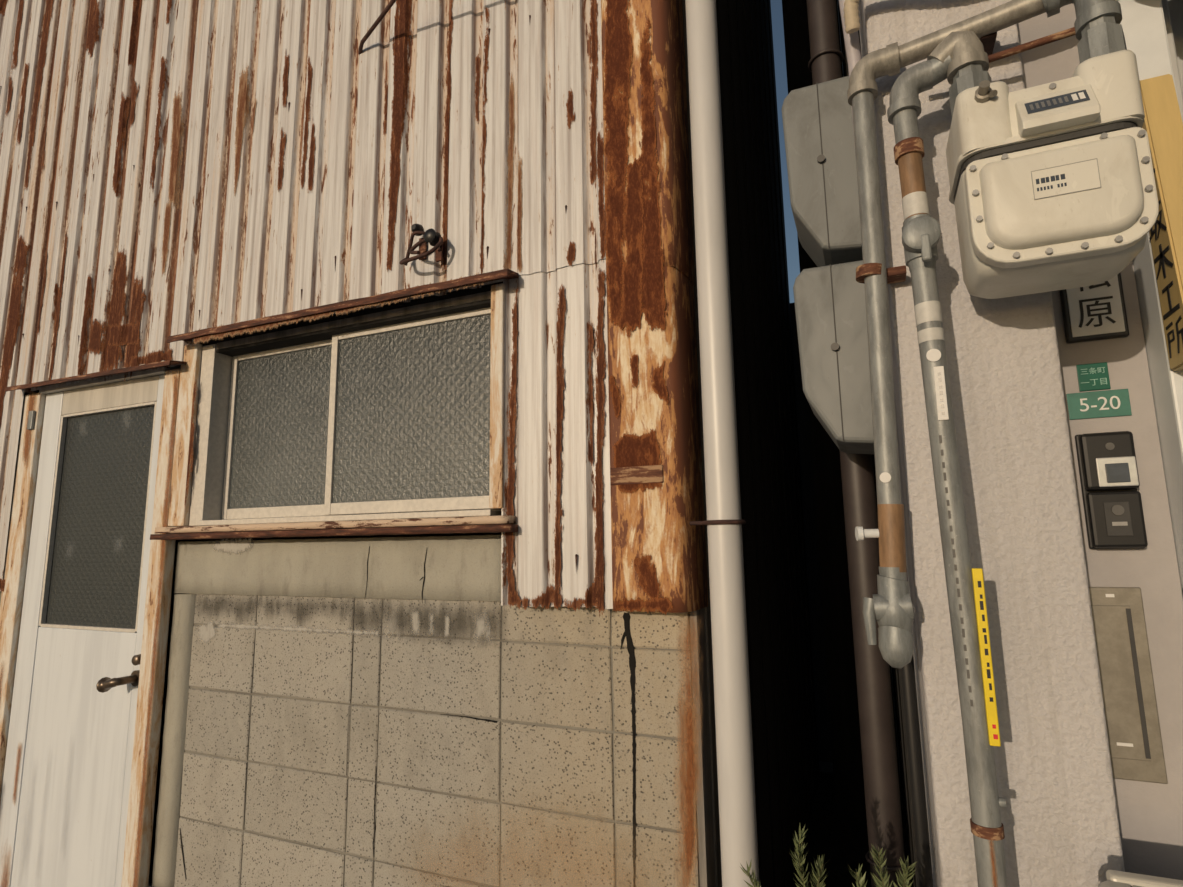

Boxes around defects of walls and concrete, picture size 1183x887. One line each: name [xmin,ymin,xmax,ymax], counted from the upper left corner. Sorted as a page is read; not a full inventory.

corrosion [0,0,54,190]
corrosion [86,0,100,58]
corrosion [112,0,142,197]
corrosion [150,56,184,273]
corrosion [194,0,490,343]
corrosion [0,235,30,426]
corrosion [37,230,68,380]
corrosion [502,0,673,618]
corrosion [185,380,198,504]
corrosion [77,246,178,887]
crack [620,613,636,887]
corrosion [679,625,699,887]